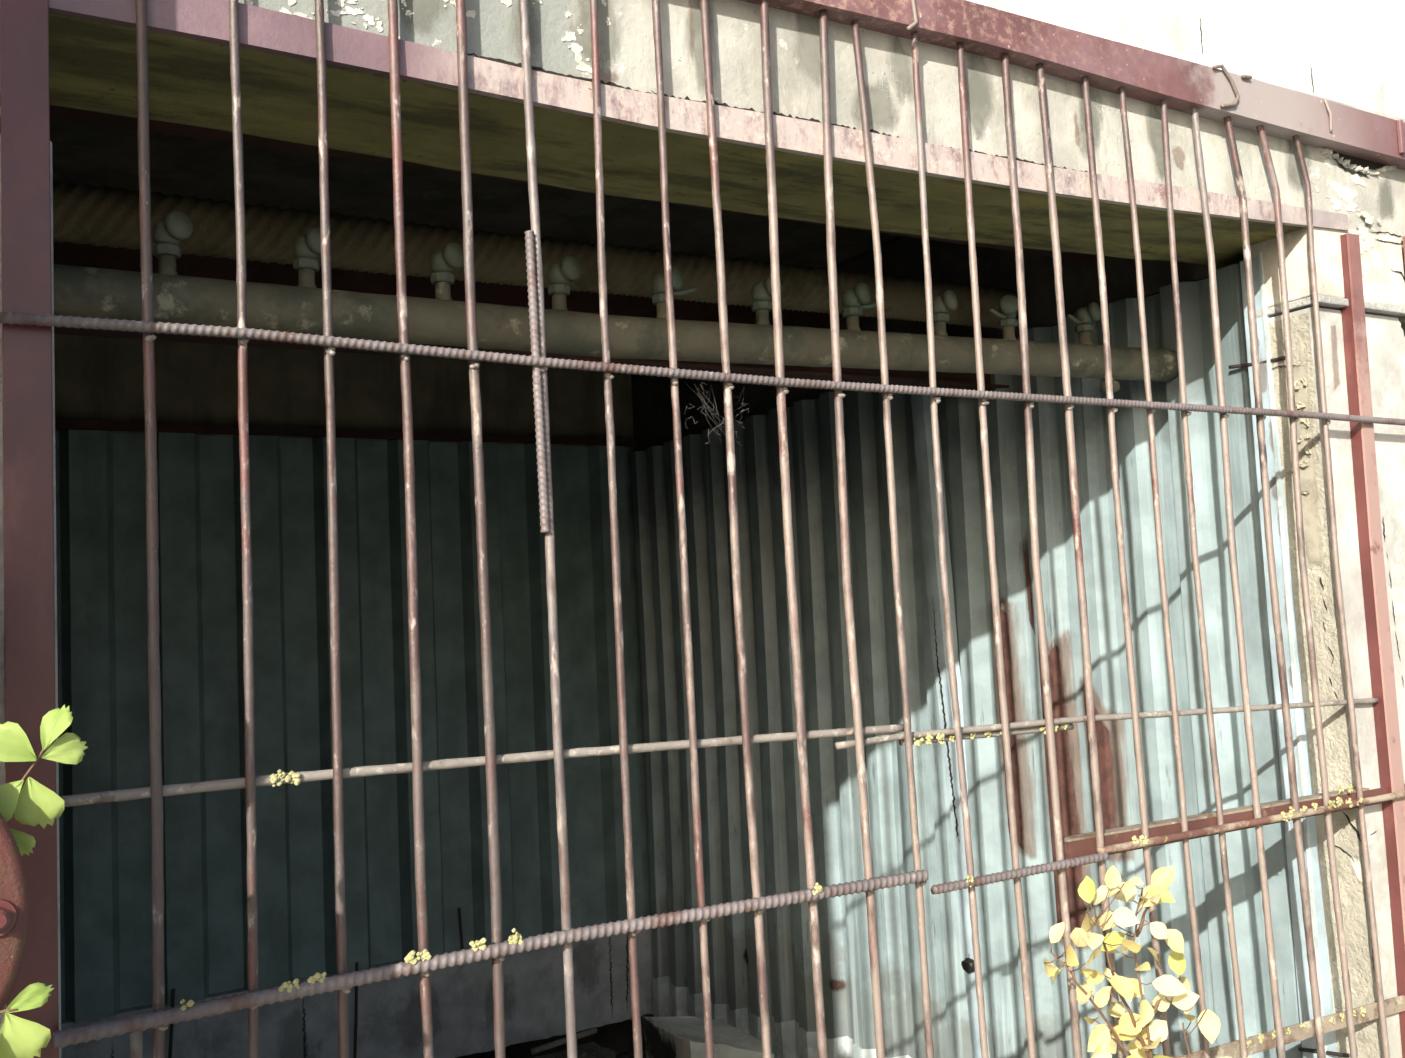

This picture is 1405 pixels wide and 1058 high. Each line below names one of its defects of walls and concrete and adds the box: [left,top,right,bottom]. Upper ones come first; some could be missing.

peeling [562,11,592,74]
spalling [1311,147,1397,271]
rust [991,598,1031,856]
rust [1024,543,1127,947]